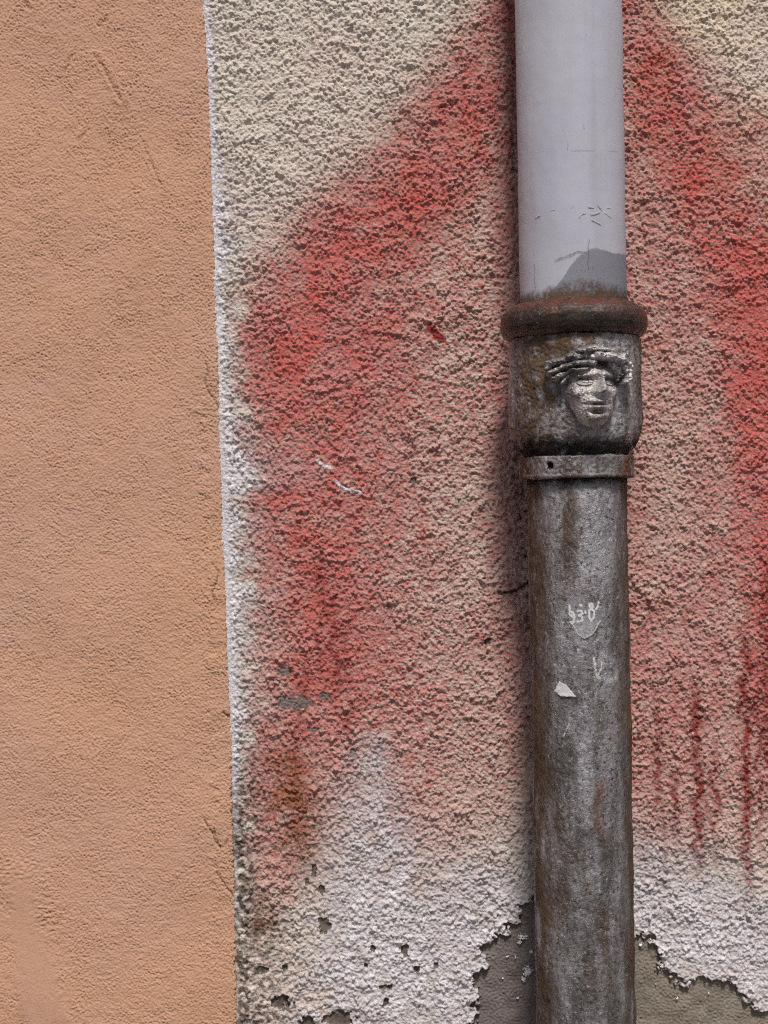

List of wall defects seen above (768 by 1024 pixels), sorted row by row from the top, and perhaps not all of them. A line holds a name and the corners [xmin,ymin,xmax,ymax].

peeling [305,864,325,895]
peeling [318,913,332,934]
peeling [401,944,420,973]
peeling [469,895,536,1024]
peeling [634,931,768,1024]
peeling [271,995,295,1009]
peeling [297,1009,358,1024]
peeling [379,984,393,1007]